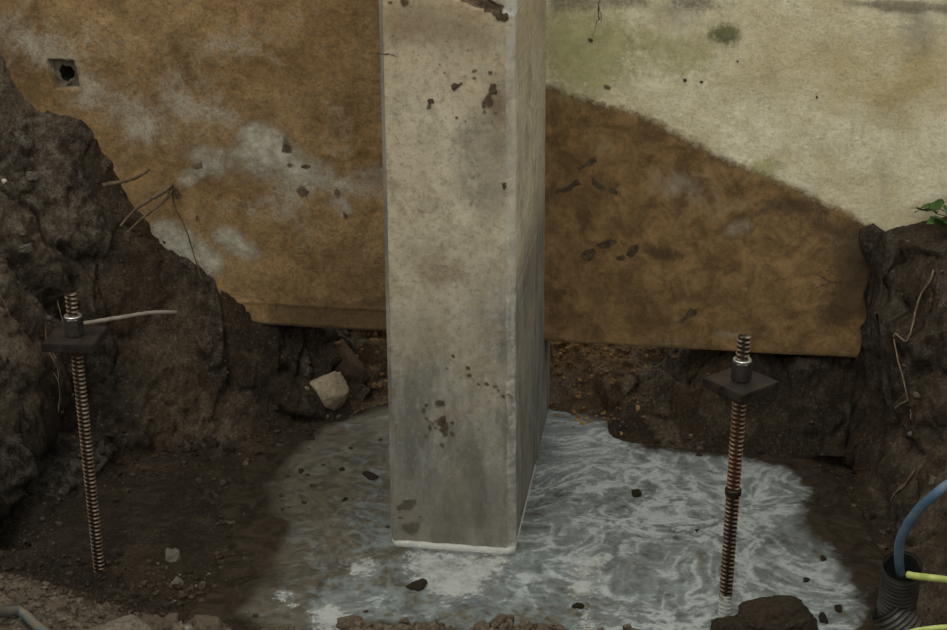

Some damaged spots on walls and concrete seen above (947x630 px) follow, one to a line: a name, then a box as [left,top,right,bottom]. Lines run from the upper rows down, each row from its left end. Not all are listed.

spalling [461,0,504,13]
water stain [196,127,321,179]
water stain [152,222,219,273]
water stain [820,221,870,323]